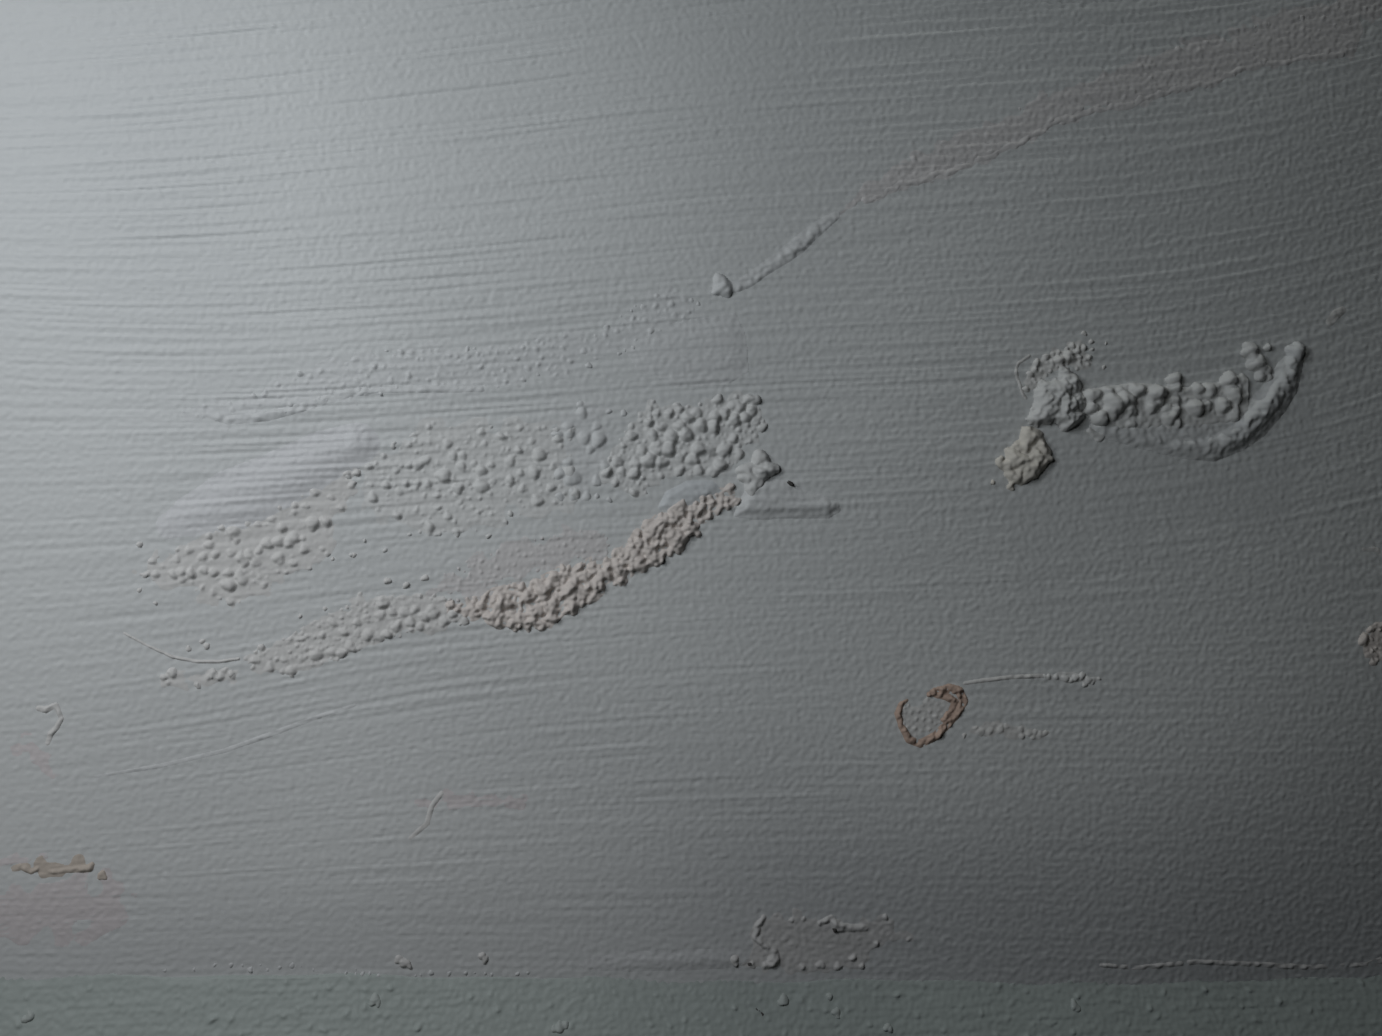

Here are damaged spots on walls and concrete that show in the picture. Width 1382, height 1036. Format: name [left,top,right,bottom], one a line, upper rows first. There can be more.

flaking render [901,697,950,737]